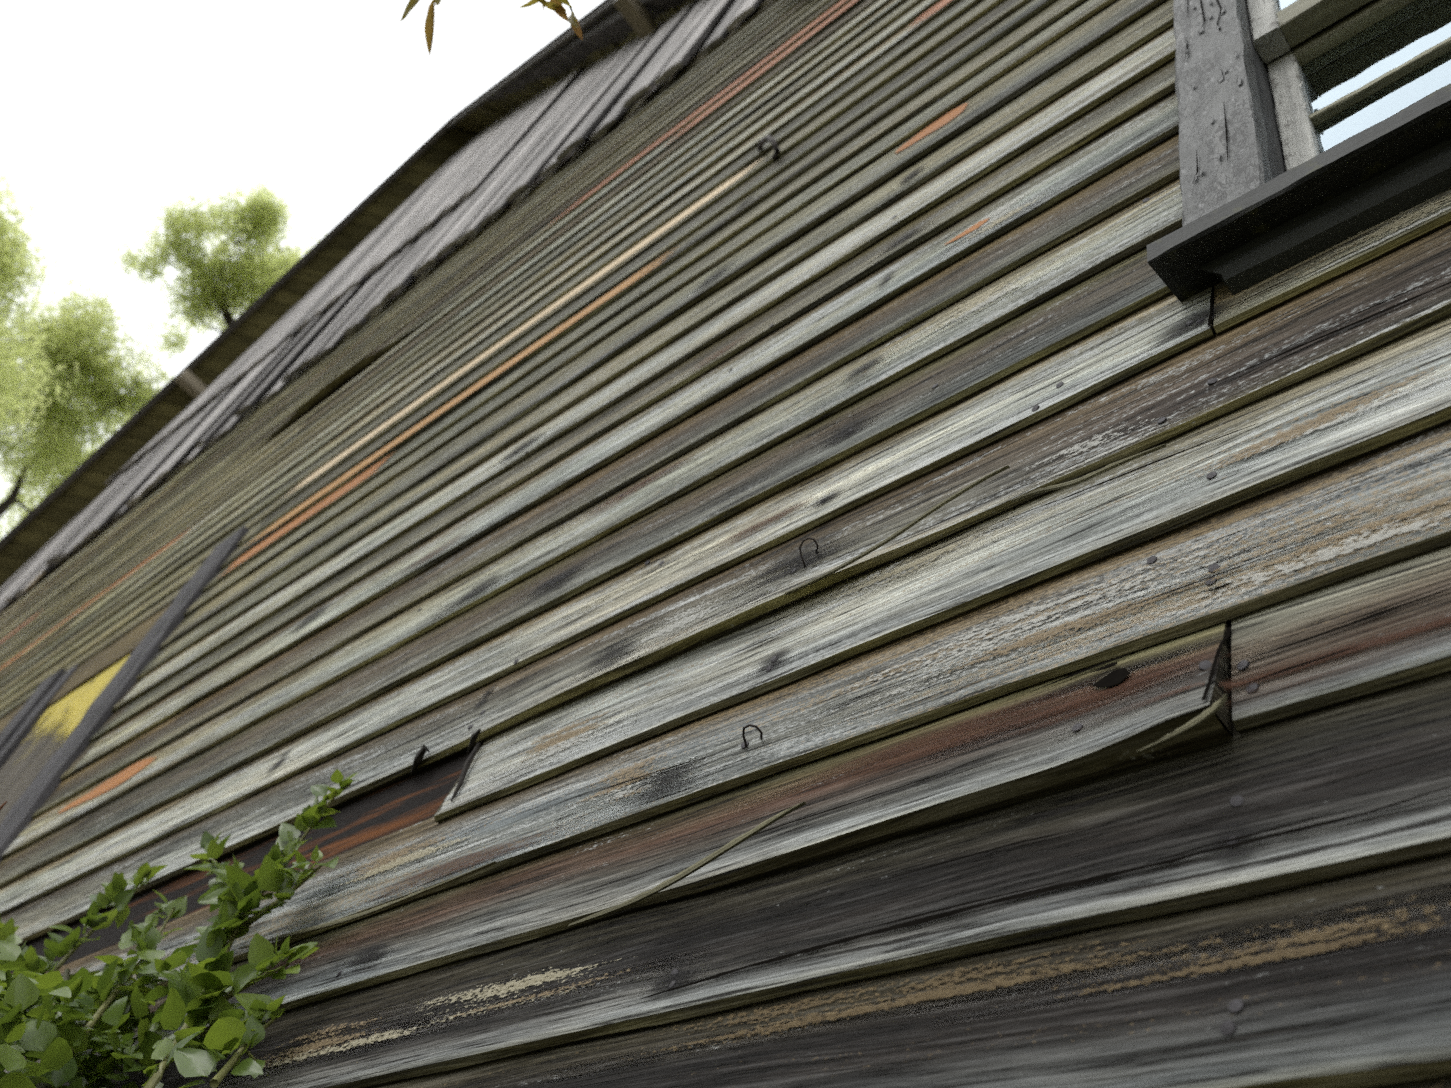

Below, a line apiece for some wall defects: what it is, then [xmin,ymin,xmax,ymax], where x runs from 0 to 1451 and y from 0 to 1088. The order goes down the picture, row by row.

crack [1090,530,1340,621]
crack [1201,583,1451,701]